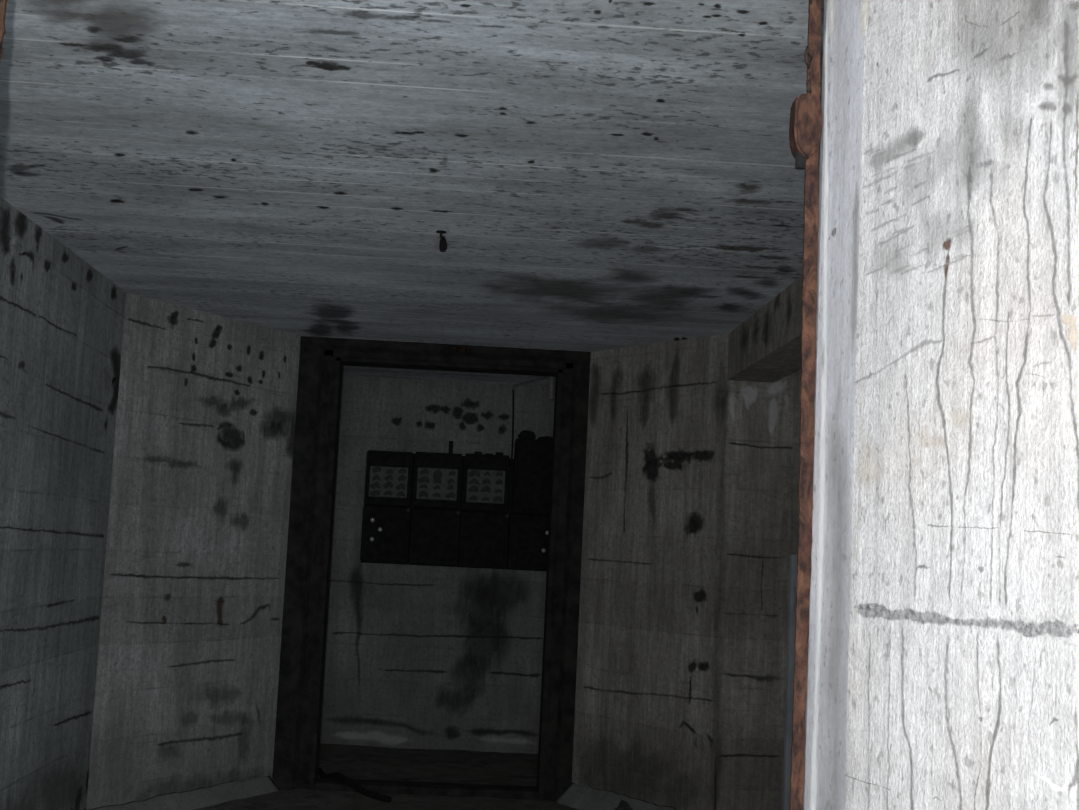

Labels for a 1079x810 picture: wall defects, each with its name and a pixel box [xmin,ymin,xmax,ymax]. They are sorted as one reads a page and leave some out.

corrosion [804,43,813,93]
crack [928,11,1020,81]
crack [918,171,975,599]
crack [1000,22,1079,602]
crack [857,602,885,610]
crack [902,633,913,810]
crack [945,642,1001,810]
crack [1070,714,1079,810]